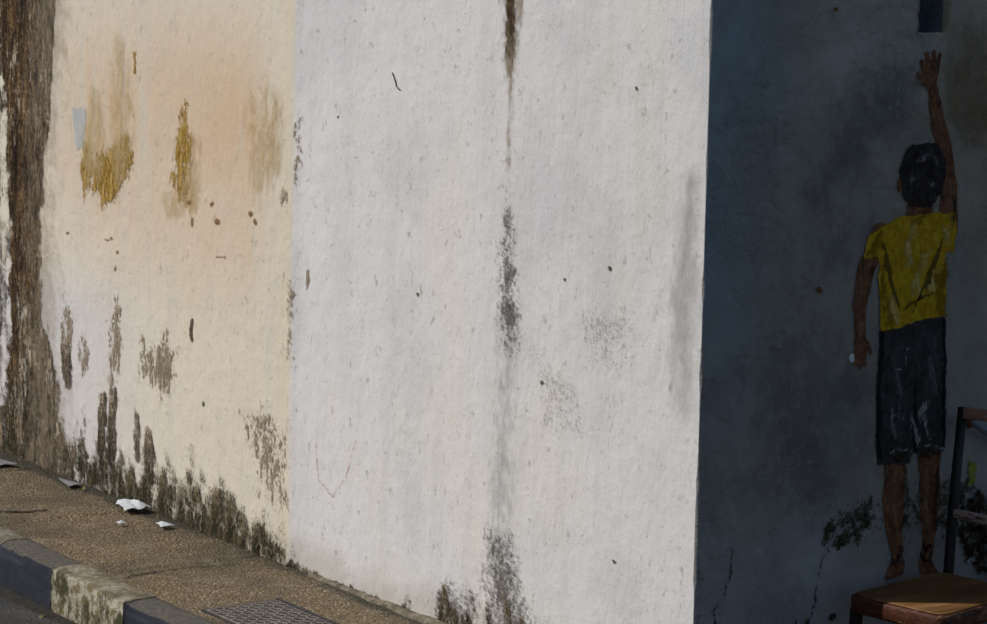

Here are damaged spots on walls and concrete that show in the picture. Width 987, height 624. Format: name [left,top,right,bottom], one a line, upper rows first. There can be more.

damp [505,0,522,98]
damp [0,0,320,576]
damp [495,206,520,356]
crack [795,512,844,624]
spalling [958,489,987,574]